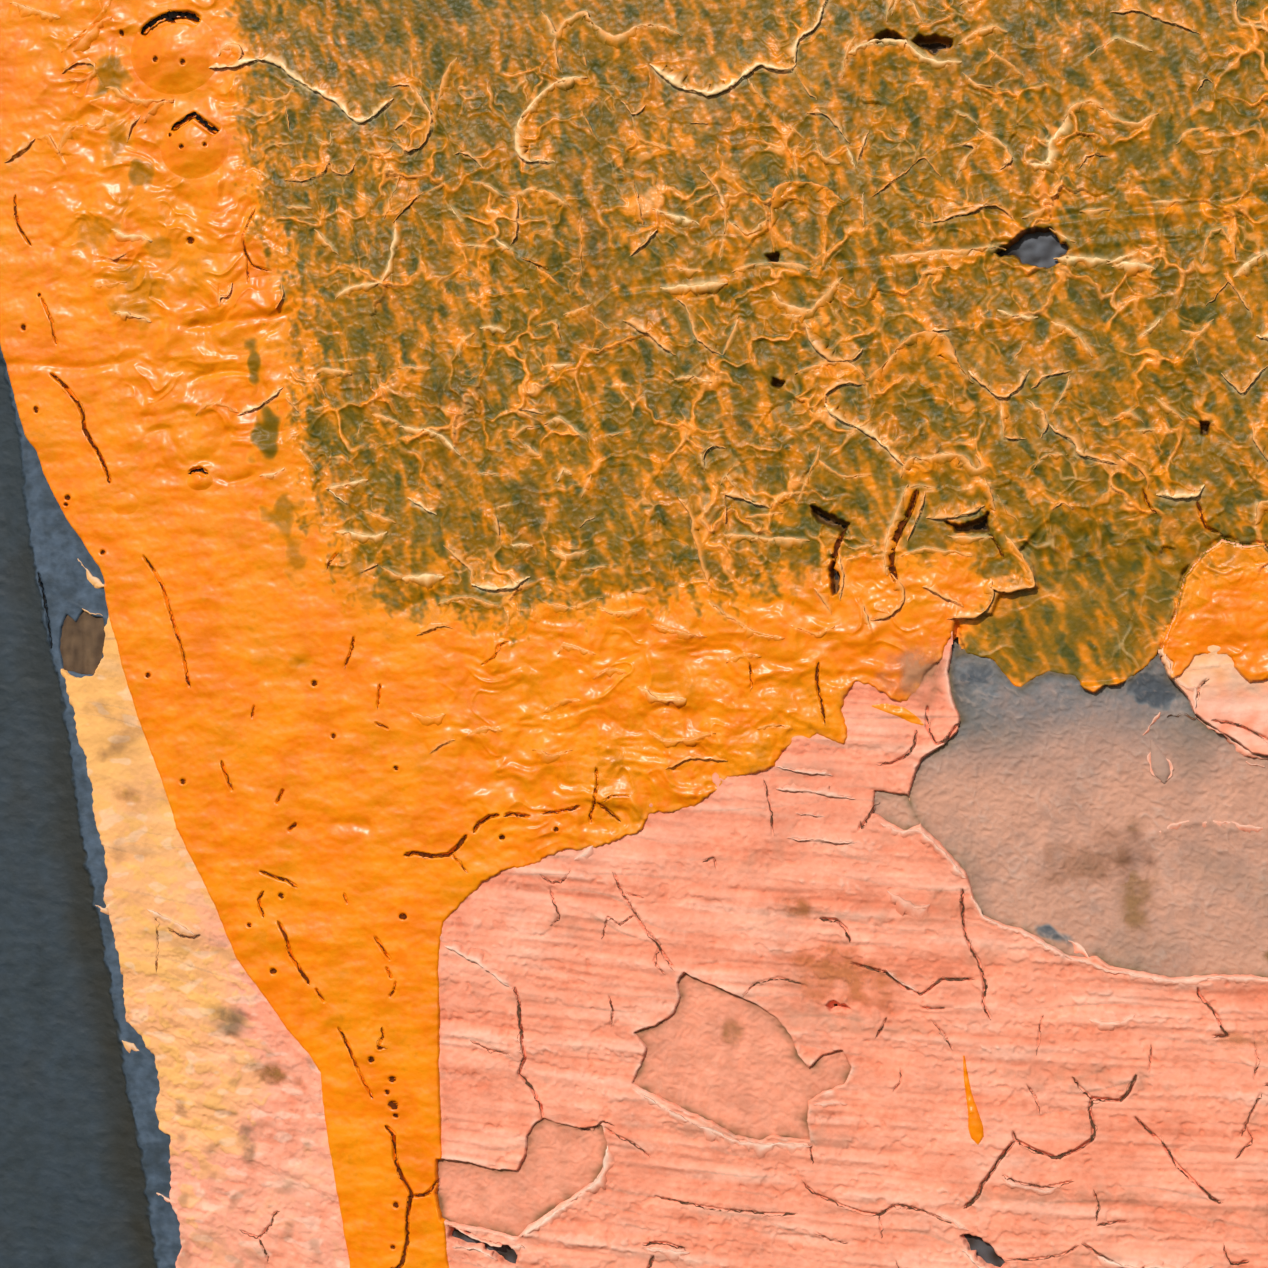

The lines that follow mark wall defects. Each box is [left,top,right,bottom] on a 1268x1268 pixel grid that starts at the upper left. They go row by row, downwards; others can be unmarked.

crack [50,373,110,483]
crack [888,489,919,581]
spalling [60,611,105,675]
crack [405,767,627,872]
spalling [873,538,1268,986]
crack [820,889,990,1049]
crack [471,988,542,1118]
spalling [632,973,851,1159]
crack [338,1027,441,1268]
spalling [437,1118,615,1264]
crack [654,1048,1221,1268]
spalling [962,1234,1005,1268]